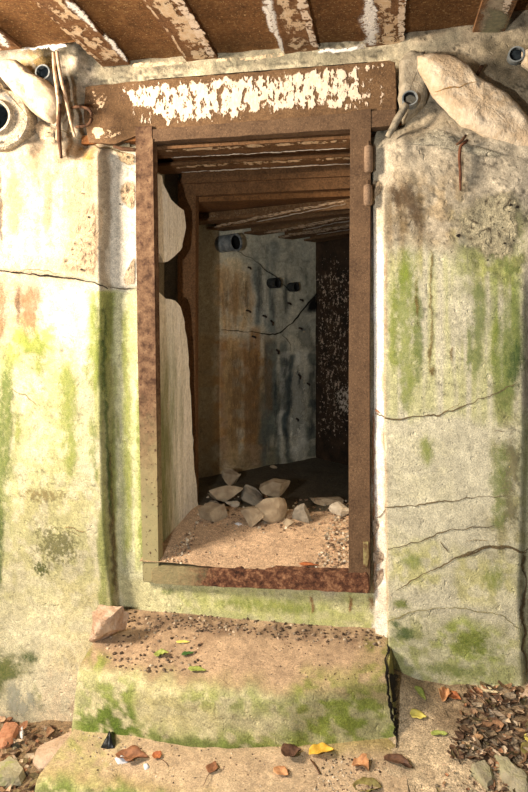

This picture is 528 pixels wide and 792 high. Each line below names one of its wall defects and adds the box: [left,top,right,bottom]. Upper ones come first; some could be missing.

peeling [37,0,119,63]
peeling [145,0,215,59]
peeling [277,0,319,51]
peeling [122,63,383,126]
water stain [15,293,39,326]
crack [0,269,135,290]
water stain [414,295,422,379]
water stain [61,369,76,468]
crack [375,384,515,420]
water stain [101,317,118,592]
crack [376,496,500,518]
crack [384,525,528,748]